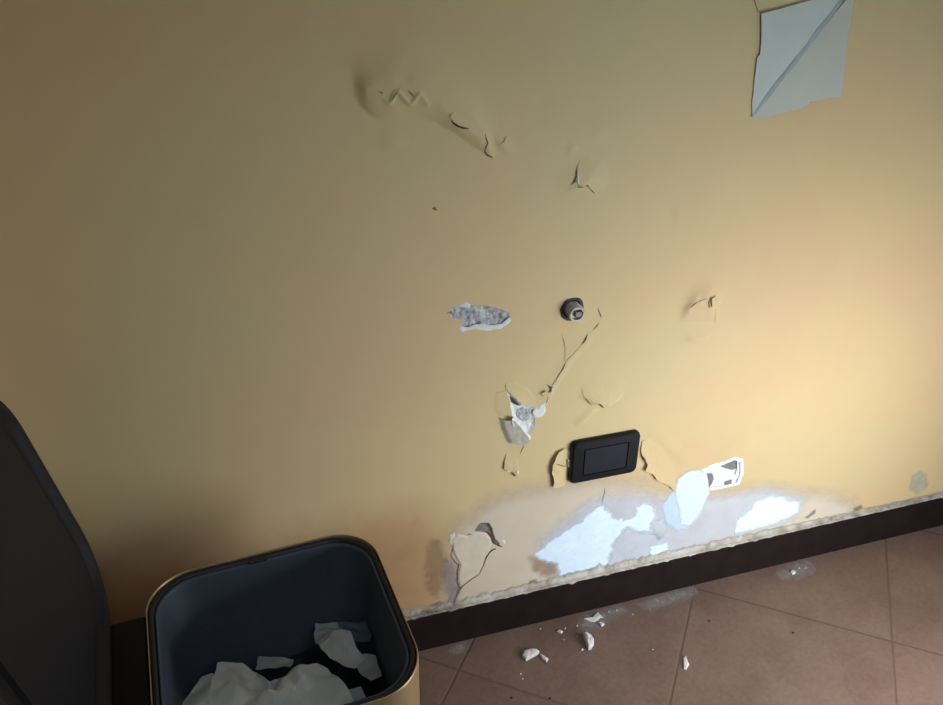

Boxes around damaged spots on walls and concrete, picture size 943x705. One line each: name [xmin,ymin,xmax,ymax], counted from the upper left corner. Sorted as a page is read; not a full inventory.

flaking render [446,302,511,332]
crack [535,309,602,406]
peeling [494,380,546,445]
peeling [552,449,570,488]
flaking render [702,457,744,491]
leakage [451,481,852,603]
flaking render [403,492,943,621]